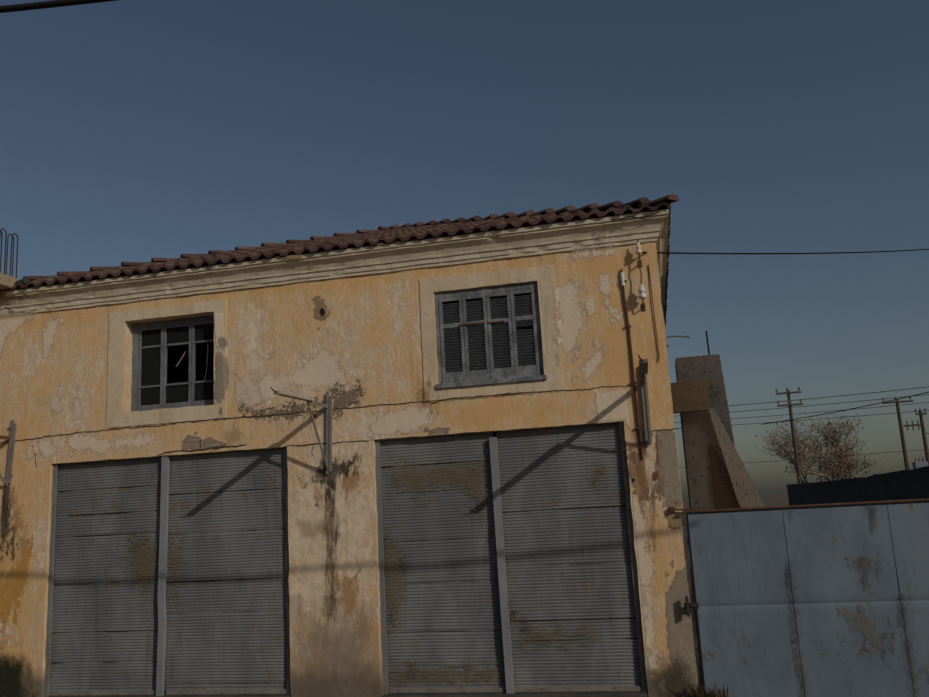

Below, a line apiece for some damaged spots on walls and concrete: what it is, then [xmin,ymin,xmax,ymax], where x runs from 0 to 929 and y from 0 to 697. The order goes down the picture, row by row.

spalling [181,432,226,452]
peeling [214,311,229,414]
peeling [237,347,366,424]
spalling [312,296,330,330]
peeling [551,272,628,385]
peeling [595,389,631,428]
water stain [0,487,19,562]
water stain [300,453,363,622]
peeling [628,429,700,692]
water stain [0,657,31,697]